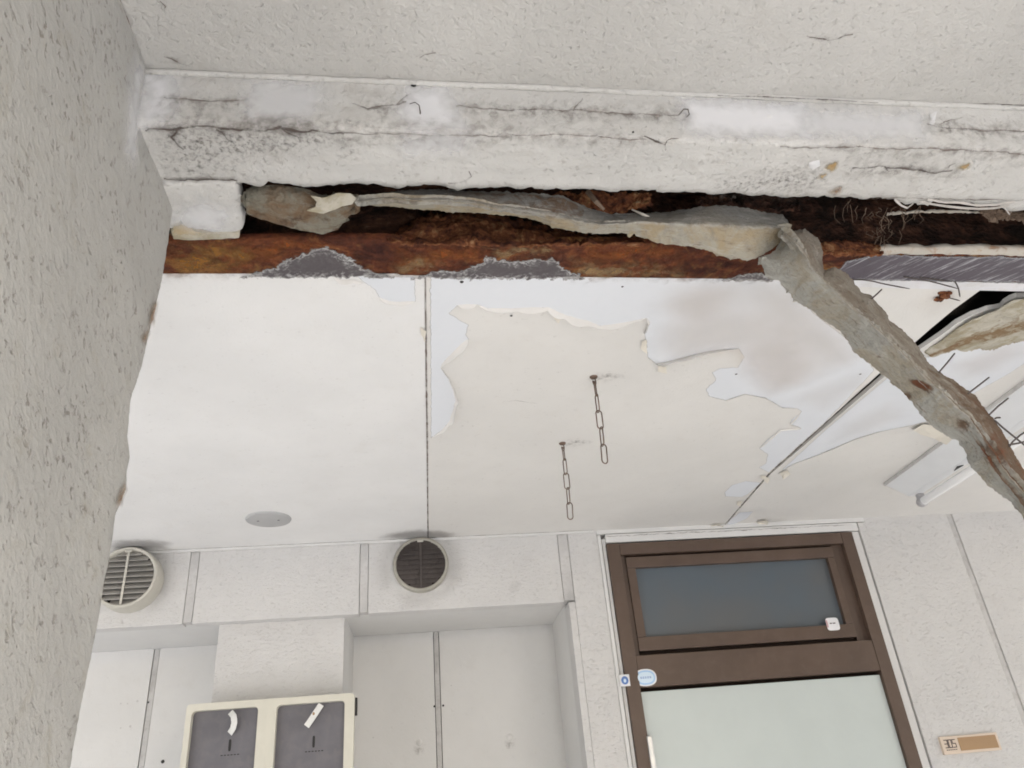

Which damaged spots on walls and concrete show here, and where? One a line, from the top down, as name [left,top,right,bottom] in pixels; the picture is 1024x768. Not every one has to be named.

crack [146,98,679,150]
peeling [307,193,356,214]
peeling [894,198,1015,215]
spalling [171,228,240,240]
rust [173,225,312,274]
rust [362,211,667,278]
rust [682,261,750,277]
peeling [840,255,1024,283]
peeling [241,246,952,472]
peeling [924,341,1024,394]
crack [712,384,868,532]